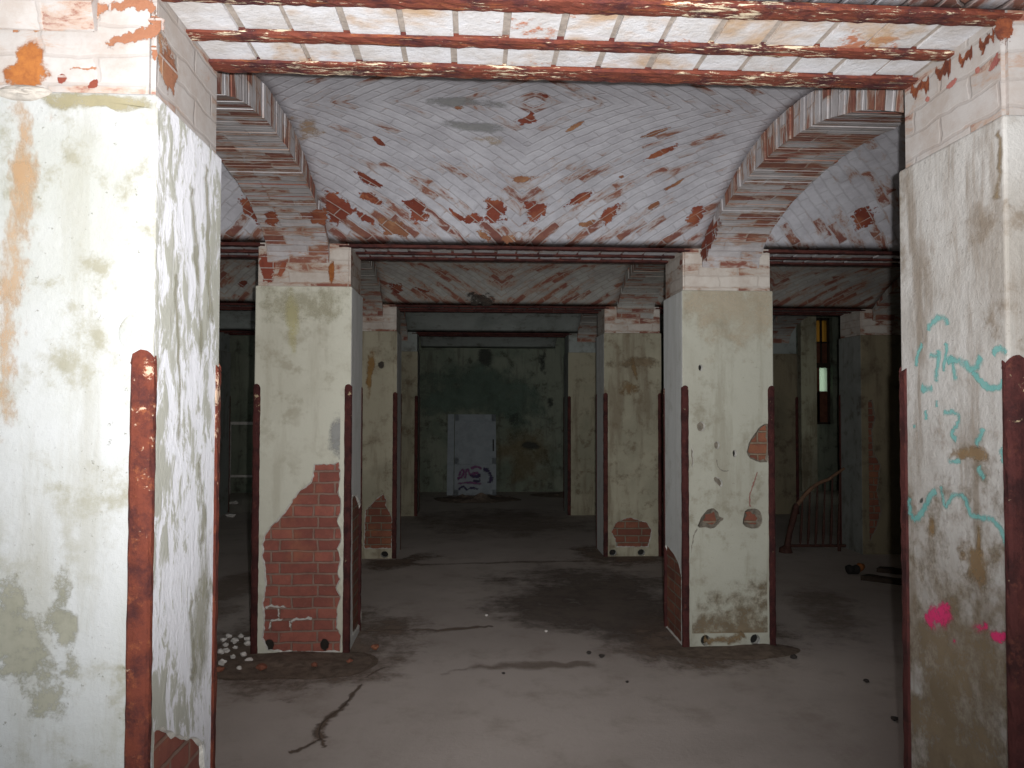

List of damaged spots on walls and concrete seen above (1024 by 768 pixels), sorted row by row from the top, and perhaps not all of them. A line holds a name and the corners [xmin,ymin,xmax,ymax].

peeling [310,171,430,238]
peeling [449,197,516,244]
peeling [523,201,548,226]
peeling [578,202,623,227]
peeling [685,203,722,261]
flaking render [733,424,768,462]
flaking render [261,462,342,652]
flaking render [611,517,652,556]
flaking render [698,508,723,529]
flaking render [743,508,762,529]
crack [289,667,385,753]
flaking render [153,726,205,768]